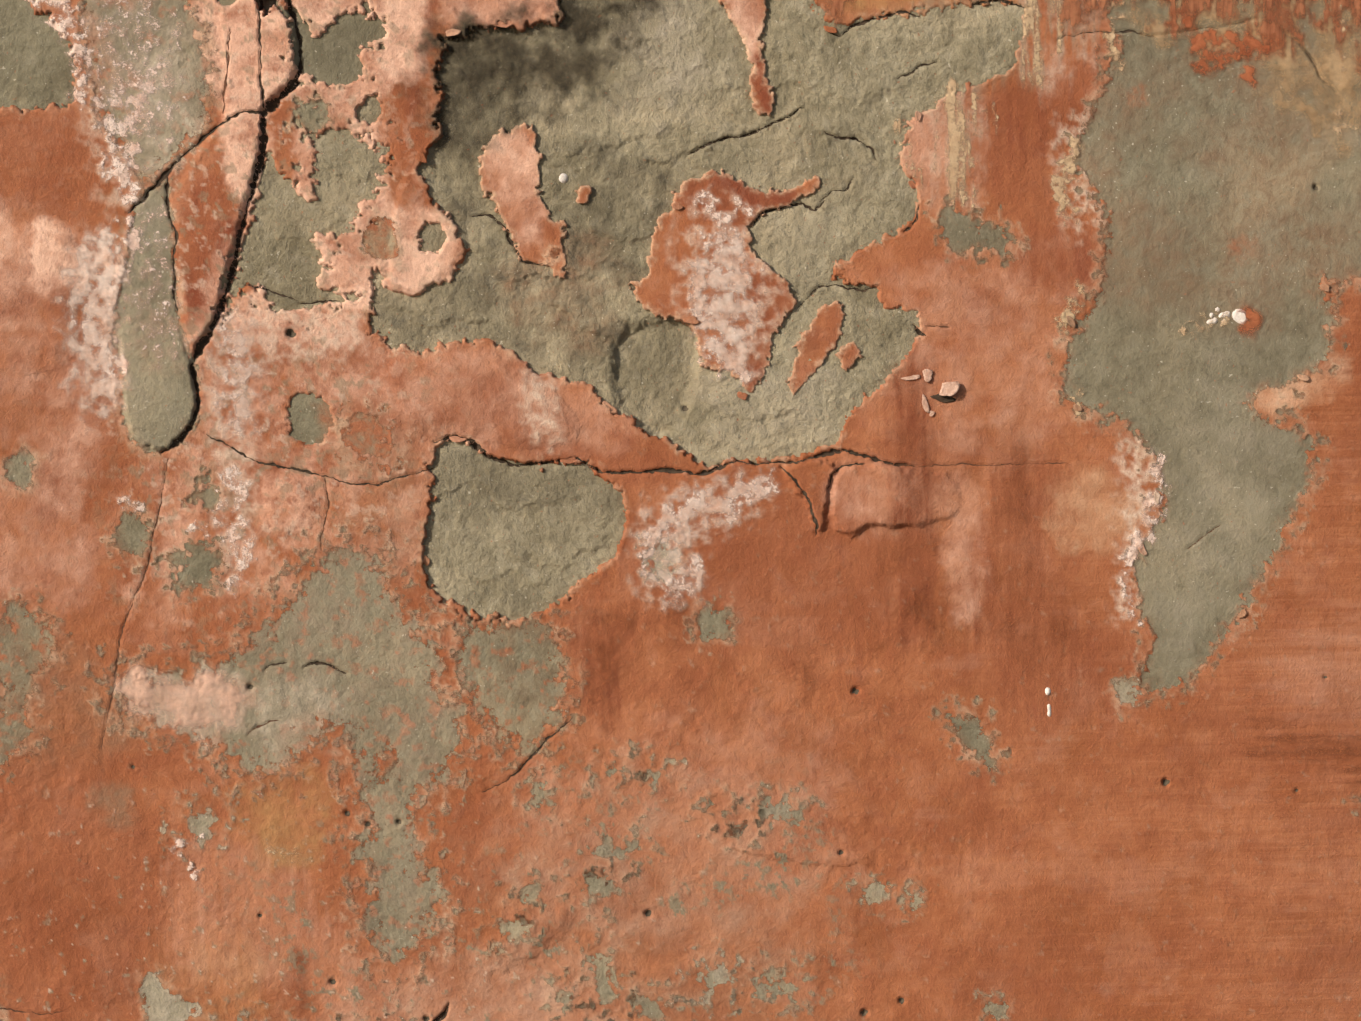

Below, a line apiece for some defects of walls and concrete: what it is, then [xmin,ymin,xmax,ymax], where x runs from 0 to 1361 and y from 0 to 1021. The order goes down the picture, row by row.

flaking render [0,0,220,456]
peeling [0,436,825,1021]
crack [101,0,1070,749]
flaking render [214,0,1029,478]
efflorescence [638,468,779,609]
peeling [846,873,927,922]
peeling [932,696,1011,781]
efflorescence [1118,452,1168,626]
flaking render [1048,0,1361,720]